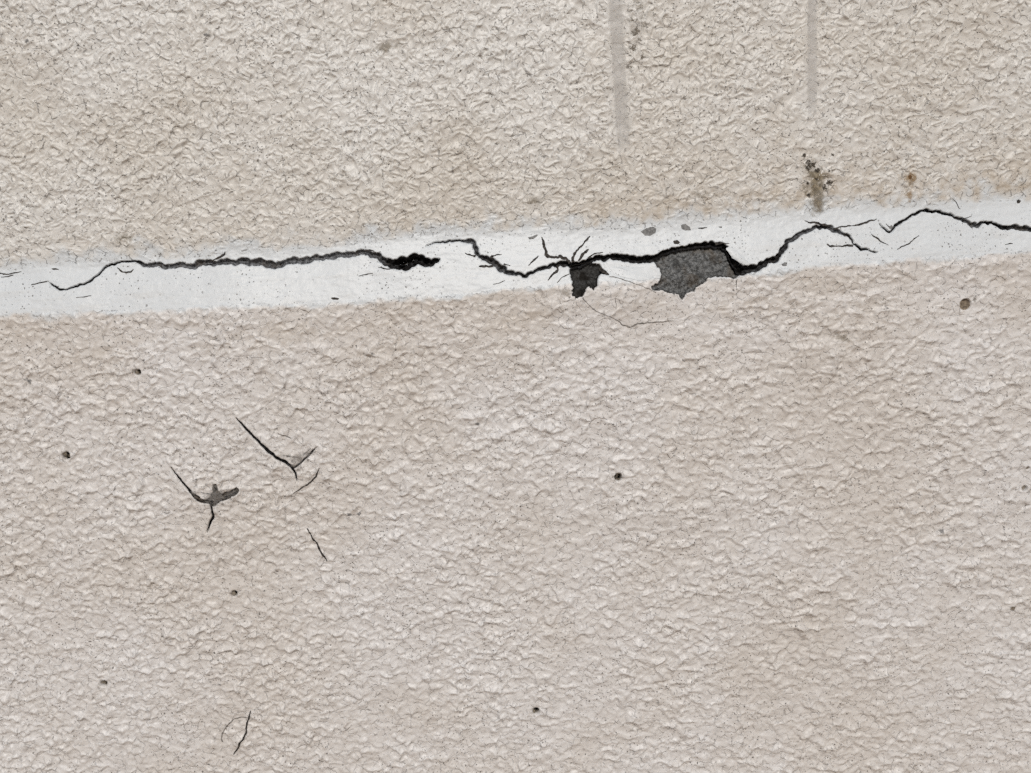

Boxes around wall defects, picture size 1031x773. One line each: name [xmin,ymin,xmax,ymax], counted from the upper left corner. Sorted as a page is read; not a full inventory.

crack [31,198,1031,328]
spalling [569,224,750,299]
crack [171,468,239,533]
crack [236,418,327,561]